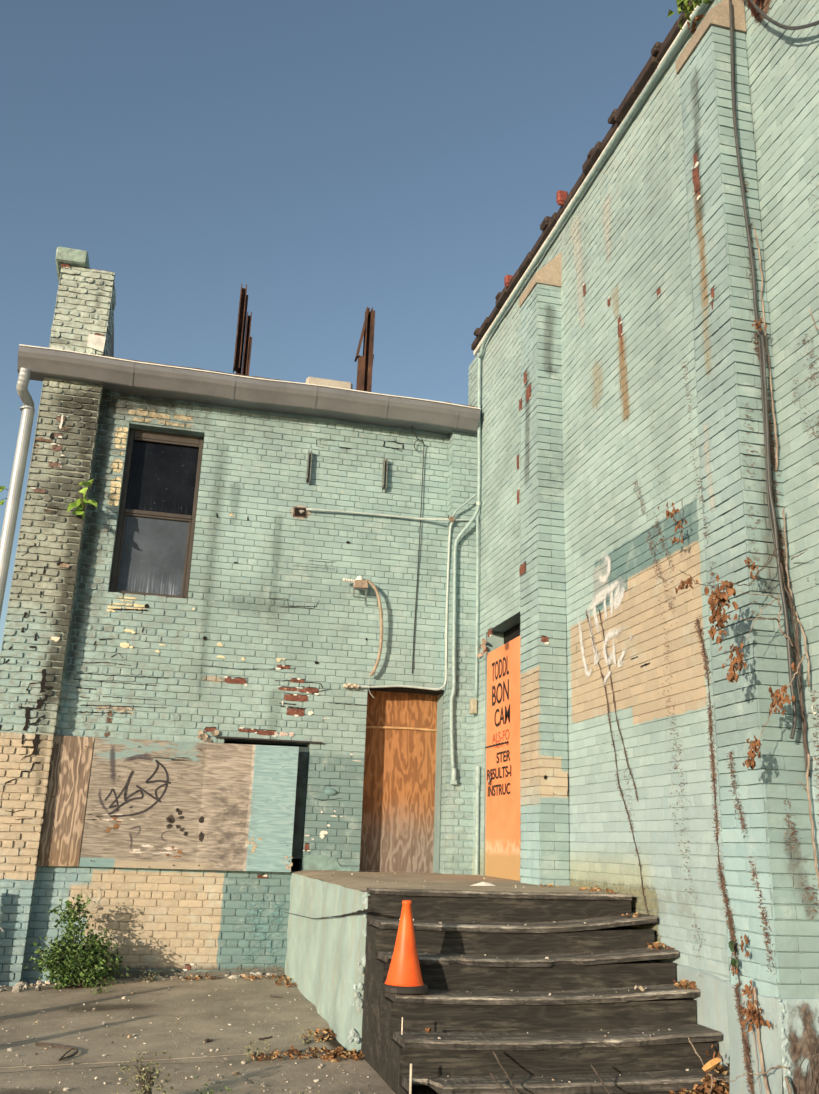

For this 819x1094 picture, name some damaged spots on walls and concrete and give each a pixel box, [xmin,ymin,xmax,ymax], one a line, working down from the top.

rust [695,192,707,305]
spalling [33,413,73,468]
peeling [107,596,148,612]
spalling [276,658,330,719]
spalling [238,727,294,737]
water stain [788,1004,819,1094]